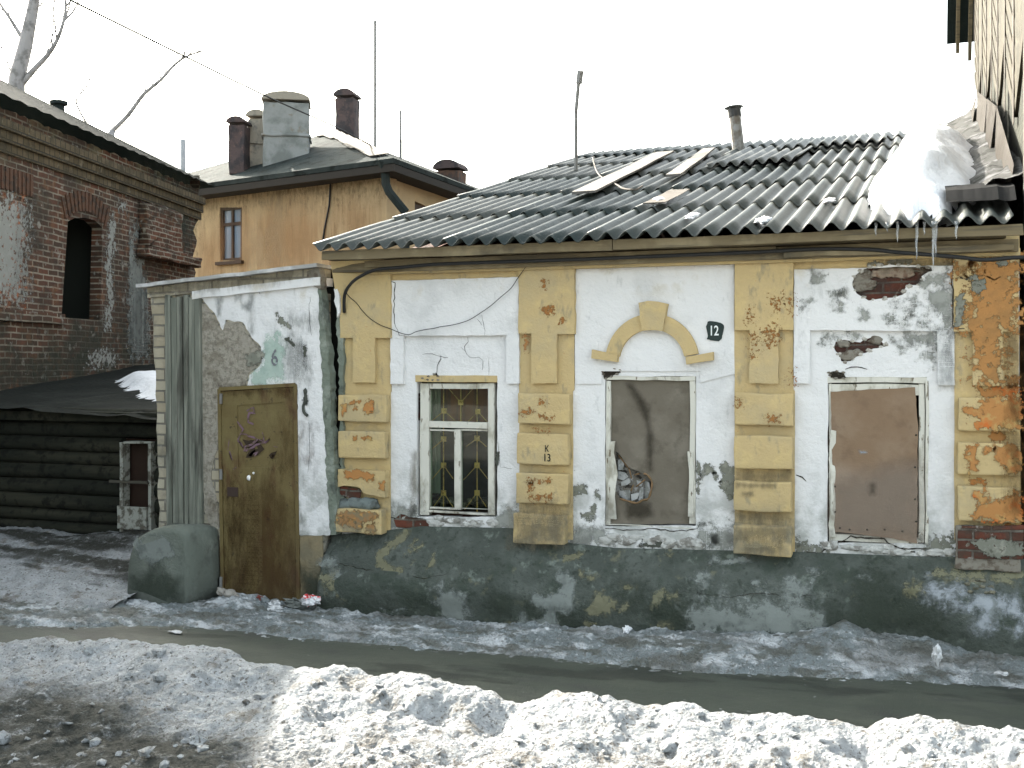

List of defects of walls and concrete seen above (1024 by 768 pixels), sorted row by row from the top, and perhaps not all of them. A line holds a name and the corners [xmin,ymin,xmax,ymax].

peeling [0,190,39,311]
spalling [852,259,932,301]
flaking render [275,312,308,357]
spalling [827,336,888,380]
peeling [902,252,1024,598]
peeling [695,460,735,500]
water stain [570,525,614,547]
water stain [697,521,735,550]
efflorescence [319,556,342,580]
water stain [557,612,580,628]
water stain [660,600,688,632]
water stain [834,576,1023,640]